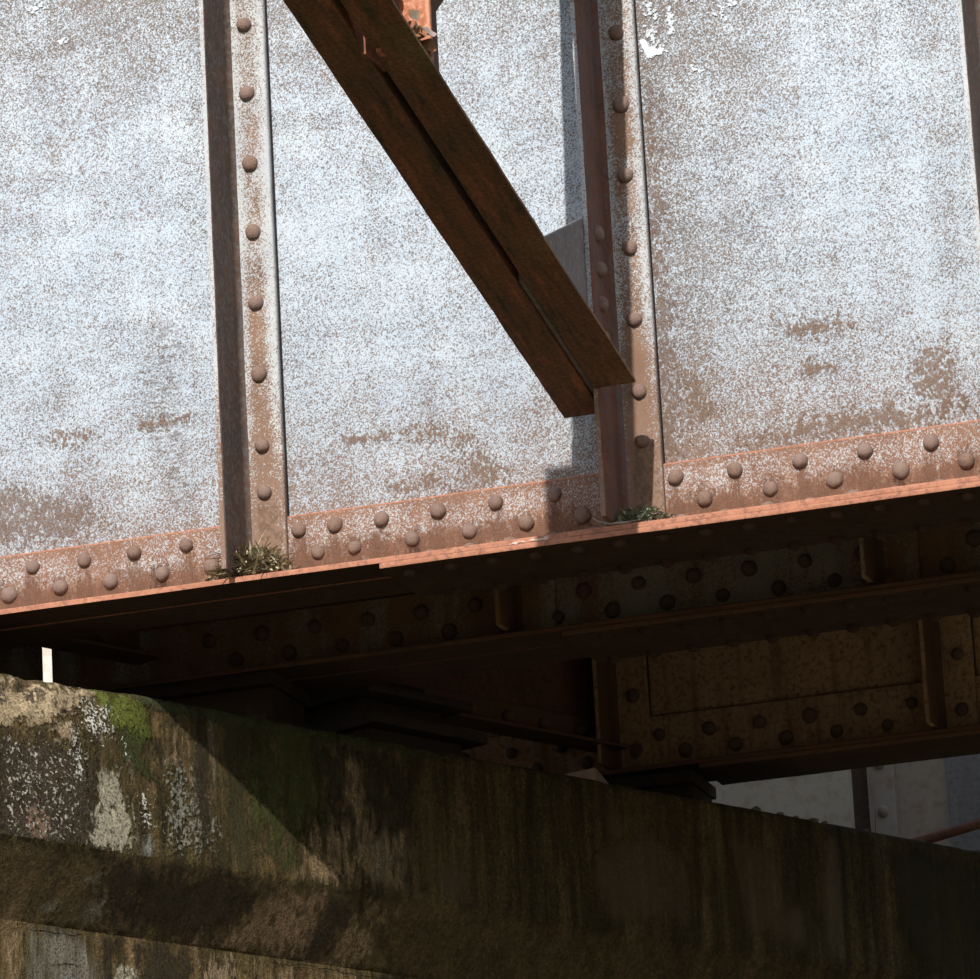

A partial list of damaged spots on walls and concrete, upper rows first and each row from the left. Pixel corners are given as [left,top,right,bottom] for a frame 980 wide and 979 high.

peeling [639,0,680,62]
corrosion [632,61,979,519]
corrosion [30,423,105,452]
corrosion [127,411,198,432]
corrosion [338,417,515,500]
corrosion [0,478,124,555]
corrosion [258,502,592,569]
corrosion [0,552,218,610]
water stain [0,705,419,979]